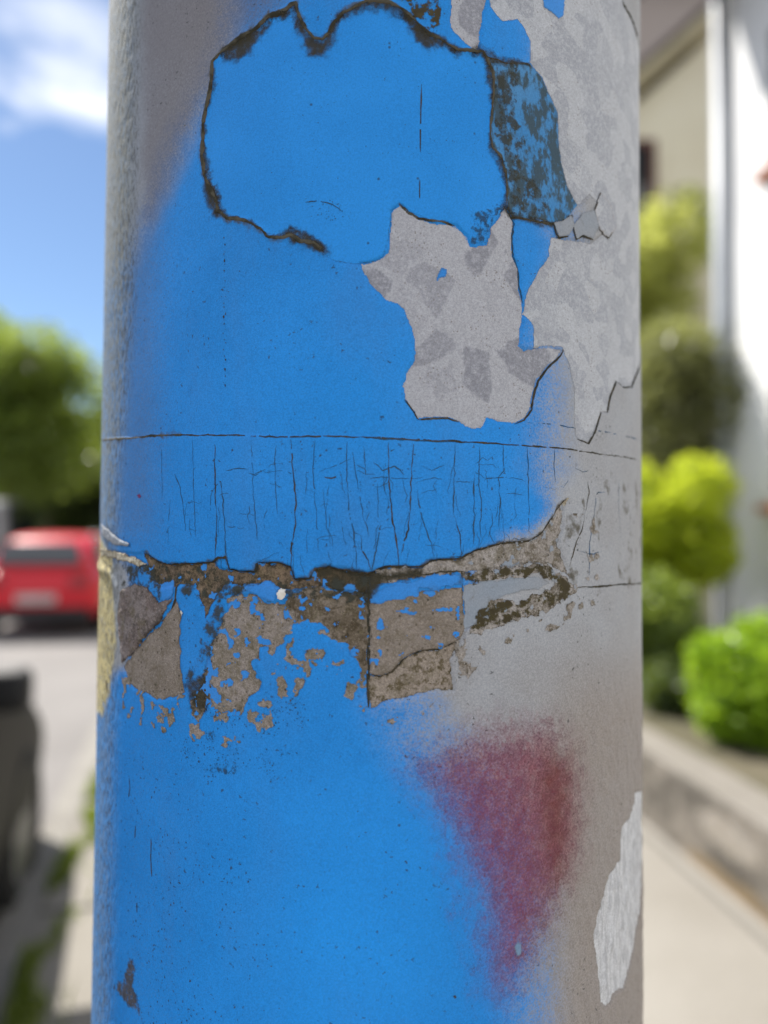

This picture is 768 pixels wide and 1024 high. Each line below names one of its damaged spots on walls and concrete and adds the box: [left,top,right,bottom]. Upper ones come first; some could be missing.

peeling [200,0,640,444]
spalling [100,498,600,742]
crack [102,423,642,595]
peeling [593,791,642,1005]